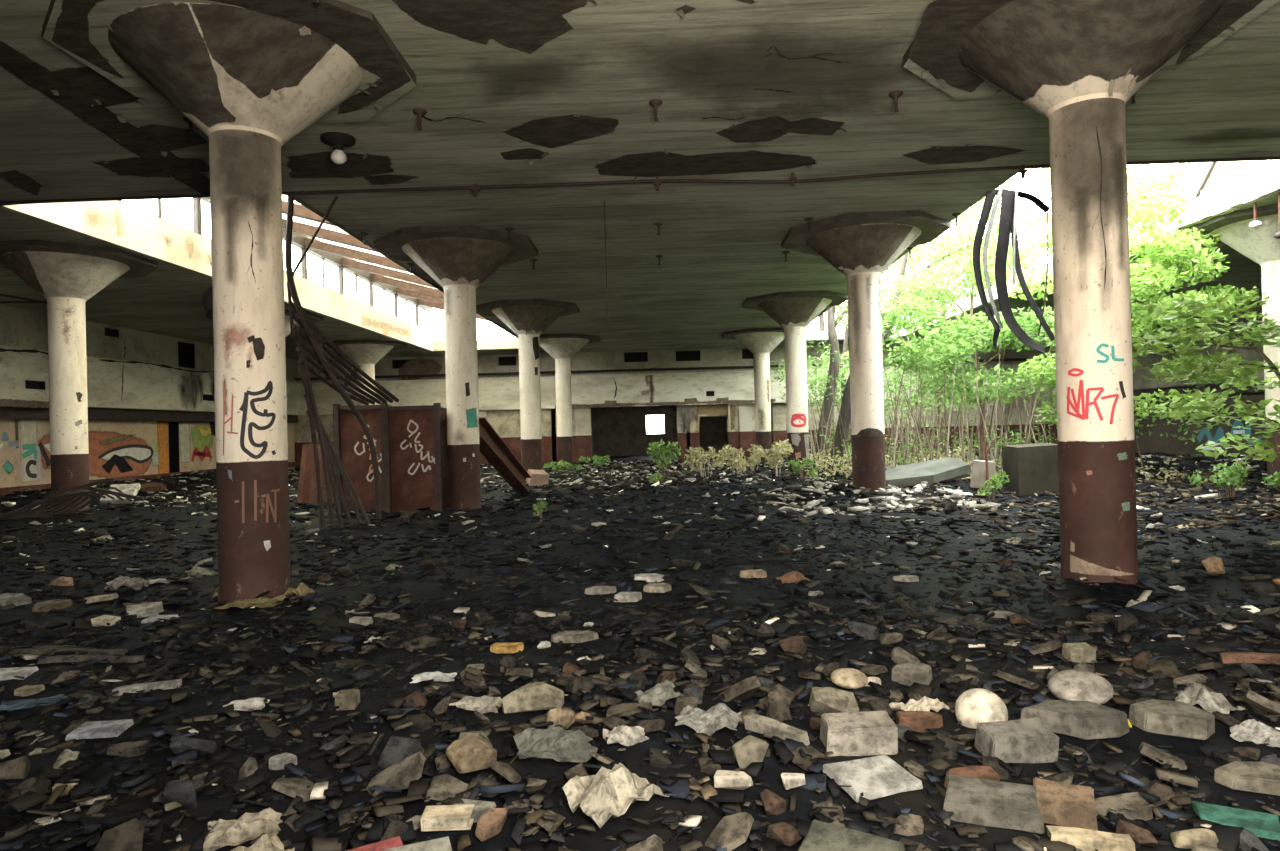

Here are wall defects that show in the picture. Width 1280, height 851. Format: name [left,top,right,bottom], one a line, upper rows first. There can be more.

peeling [0,0,419,195]
water stain [215,129,276,279]
peeling [393,0,597,54]
peeling [501,114,618,165]
peeling [595,116,847,179]
peeling [908,0,1263,102]
water stain [1059,97,1125,261]